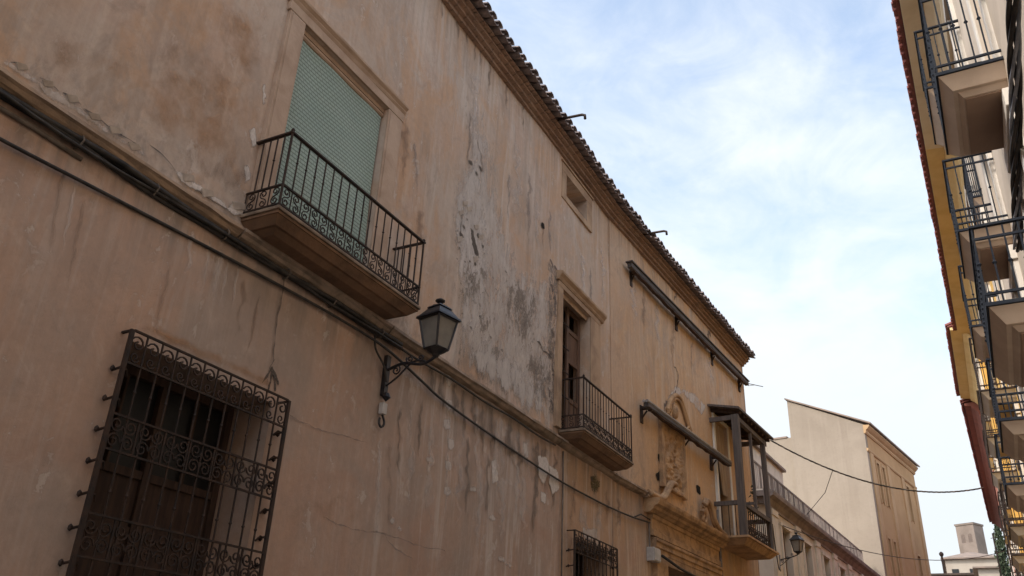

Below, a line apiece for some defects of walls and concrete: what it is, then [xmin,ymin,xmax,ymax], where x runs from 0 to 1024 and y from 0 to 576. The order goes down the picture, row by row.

flaking render [4,62,245,215]
crack [262,276,285,391]
flaking render [456,114,558,423]
flaking render [523,442,559,504]